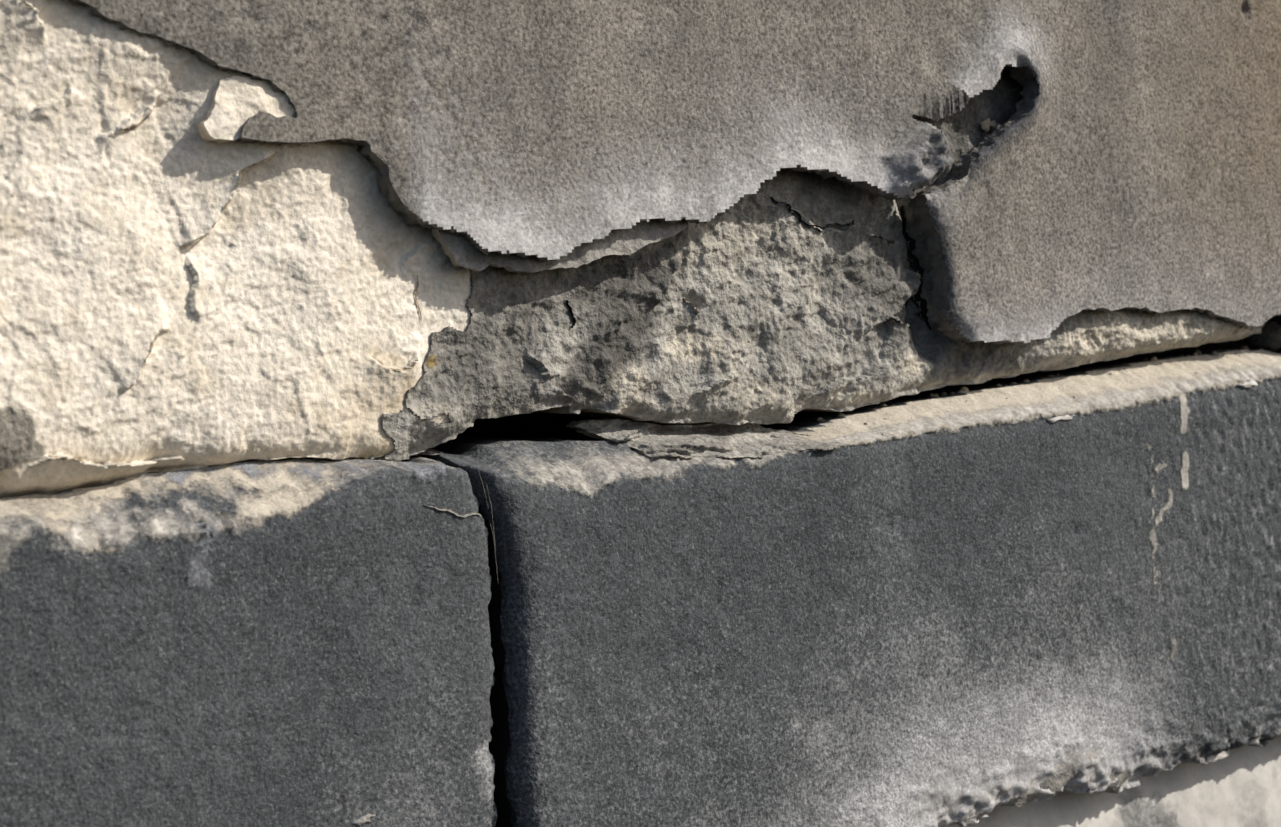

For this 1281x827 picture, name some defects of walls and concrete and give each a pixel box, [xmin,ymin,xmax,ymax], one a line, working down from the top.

spalling [0,0,1276,498]
damp [1179,392,1190,434]
damp [1148,445,1189,584]